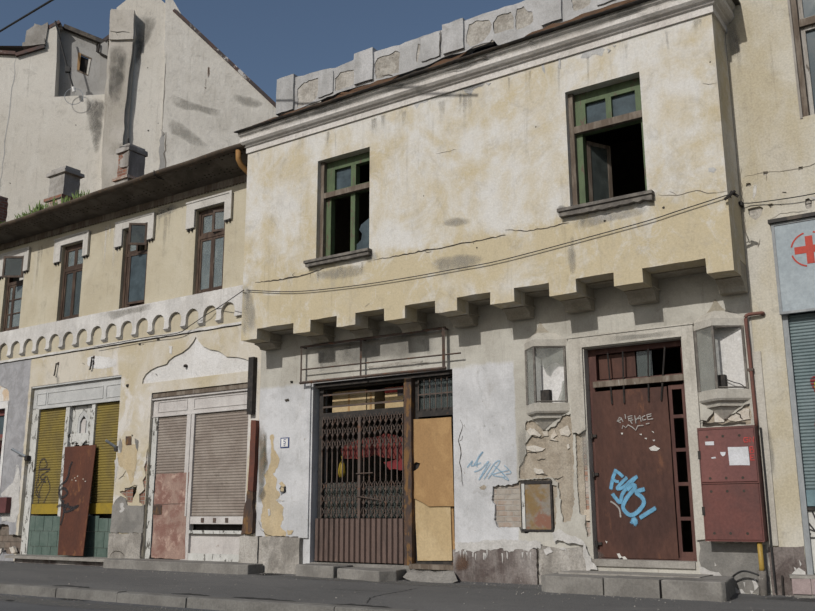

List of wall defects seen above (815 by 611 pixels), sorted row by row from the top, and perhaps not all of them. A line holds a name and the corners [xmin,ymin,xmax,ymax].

spalling [467,7,533,49]
spalling [298,78,321,107]
spalling [335,70,354,91]
spalling [375,51,400,79]
peeling [581,45,616,58]
crack [658,163,815,246]
crack [376,222,569,260]
crack [255,268,324,283]
spalling [703,403,752,427]
peeling [115,438,147,512]
peeling [259,434,293,536]
spalling [455,415,597,571]